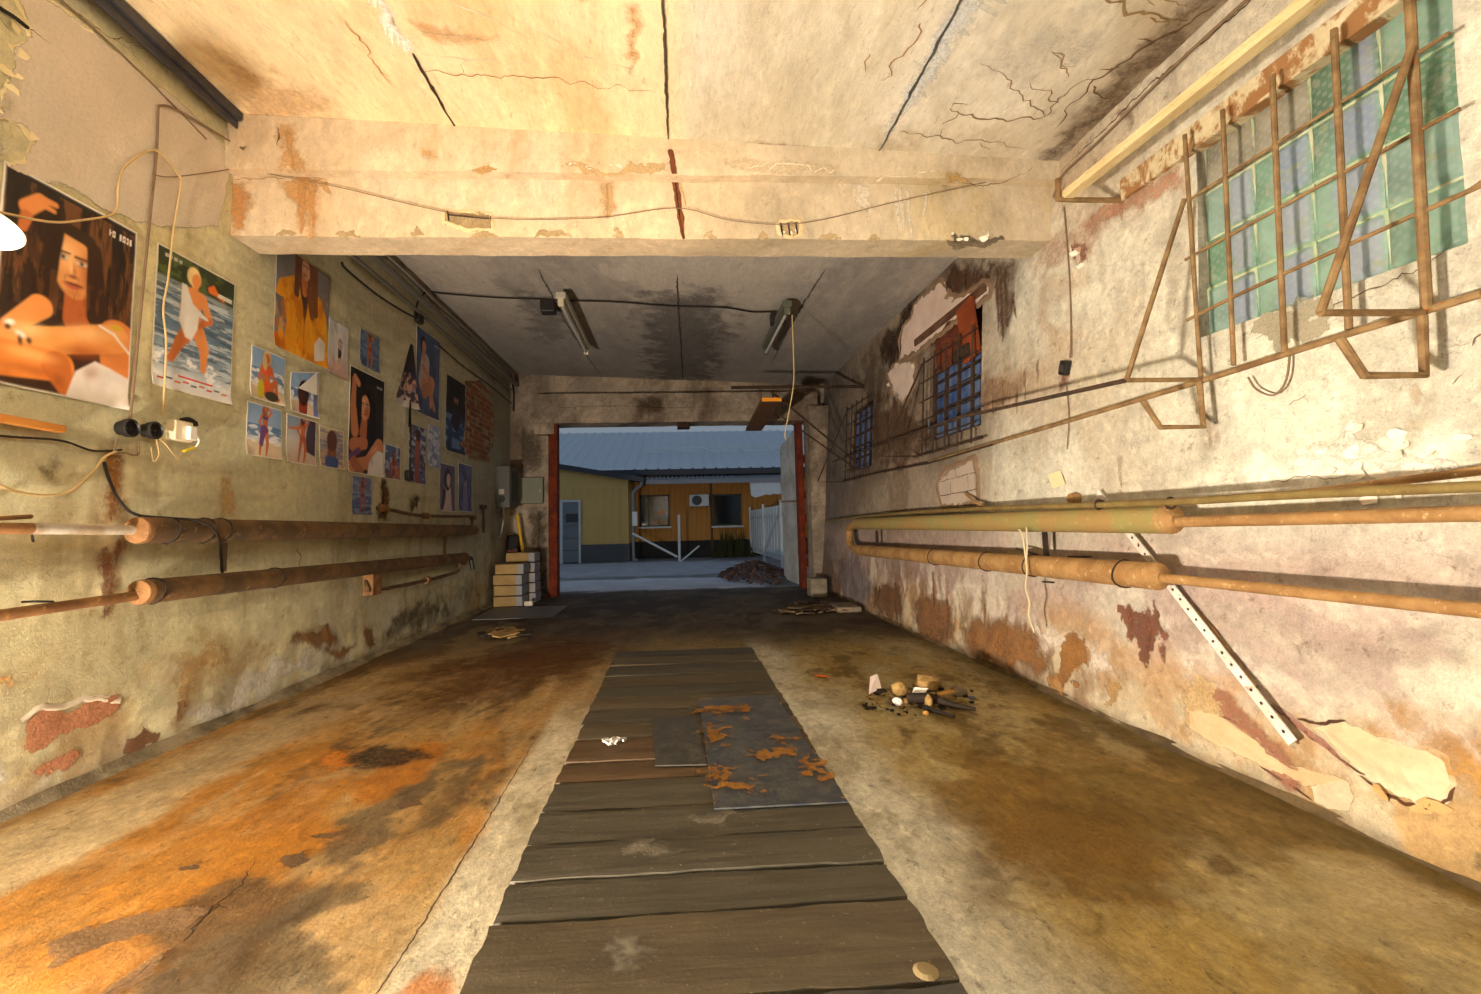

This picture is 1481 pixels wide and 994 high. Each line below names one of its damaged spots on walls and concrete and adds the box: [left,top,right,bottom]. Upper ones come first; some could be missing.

peeling [0,0,230,228]
crack [346,0,669,140]
crack [864,0,1251,210]
corrosion [668,149,686,239]
flaking render [886,278,993,407]
flaking render [19,694,121,777]
flaking render [123,726,160,755]
flaking render [177,700,186,721]
corrosion [317,751,356,770]